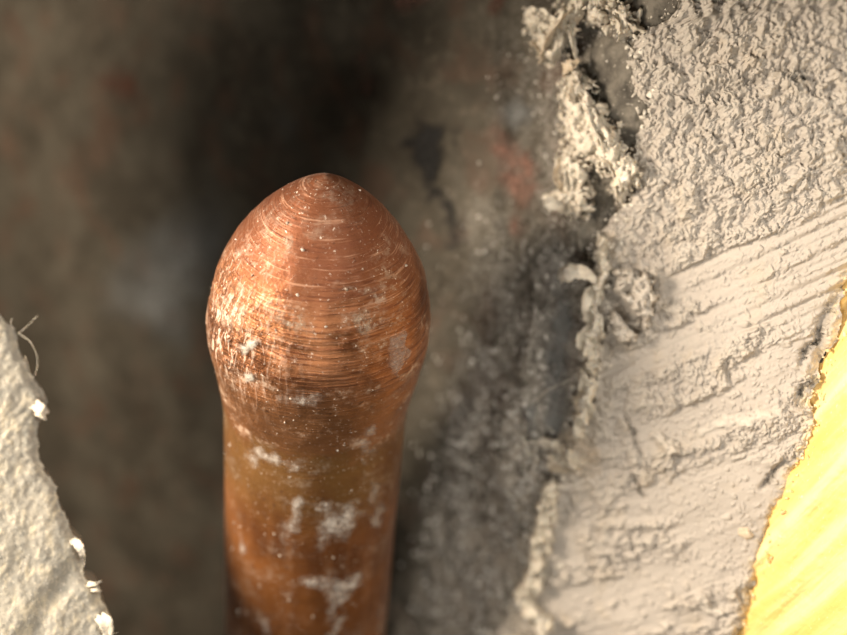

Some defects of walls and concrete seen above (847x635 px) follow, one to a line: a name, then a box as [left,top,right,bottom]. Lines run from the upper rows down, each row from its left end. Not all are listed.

spalling [524,0,679,442]